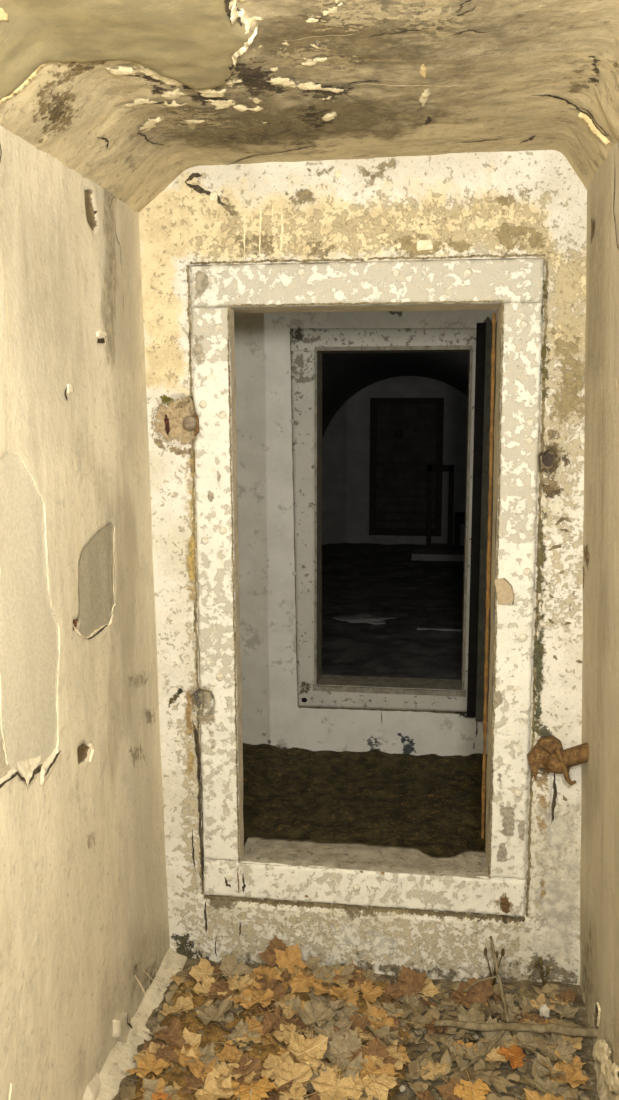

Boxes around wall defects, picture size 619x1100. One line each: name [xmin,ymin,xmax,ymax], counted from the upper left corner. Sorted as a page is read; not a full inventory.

damp [33,61,105,143]
flaking render [0,0,267,133]
crack [137,125,169,147]
crack [185,145,317,205]
damp [223,189,314,260]
damp [141,12,445,151]
peeling [265,0,476,121]
crack [531,95,619,146]
flaking render [0,451,61,793]
flaking render [73,490,116,640]
damp [533,484,572,737]
crack [192,720,246,956]